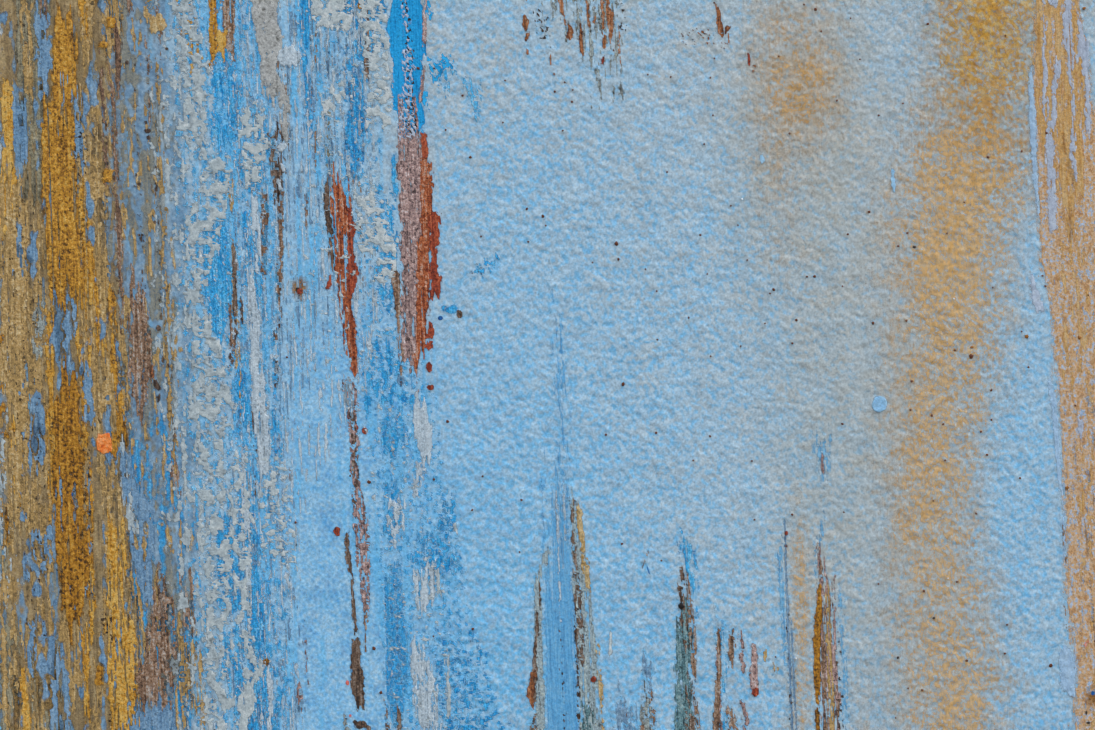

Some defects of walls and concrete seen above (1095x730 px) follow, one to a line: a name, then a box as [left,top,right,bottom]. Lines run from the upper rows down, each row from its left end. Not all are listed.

peeling [124,0,511,730]
peeling [0,471,11,545]
peeling [526,669,537,709]